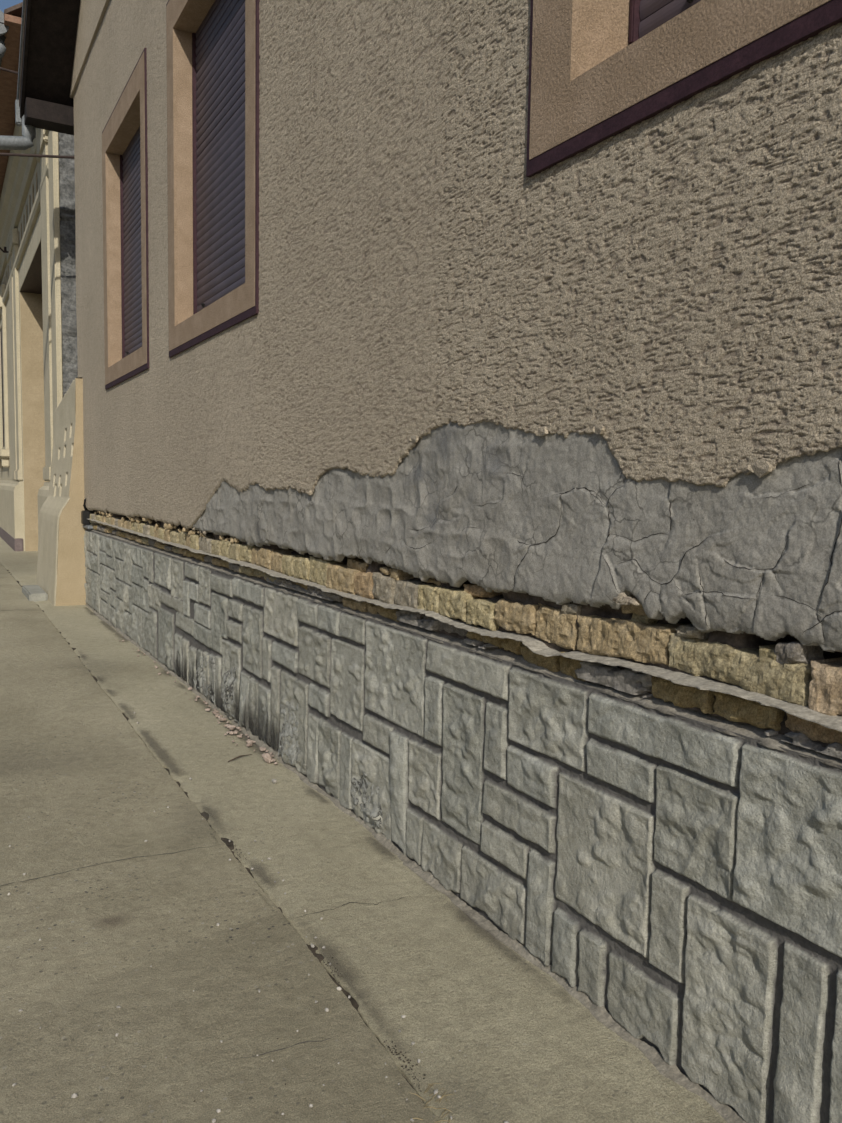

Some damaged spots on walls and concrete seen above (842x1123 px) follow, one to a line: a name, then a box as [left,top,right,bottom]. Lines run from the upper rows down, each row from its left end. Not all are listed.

flaking render [87,421,842,767]
crack [514,485,842,642]